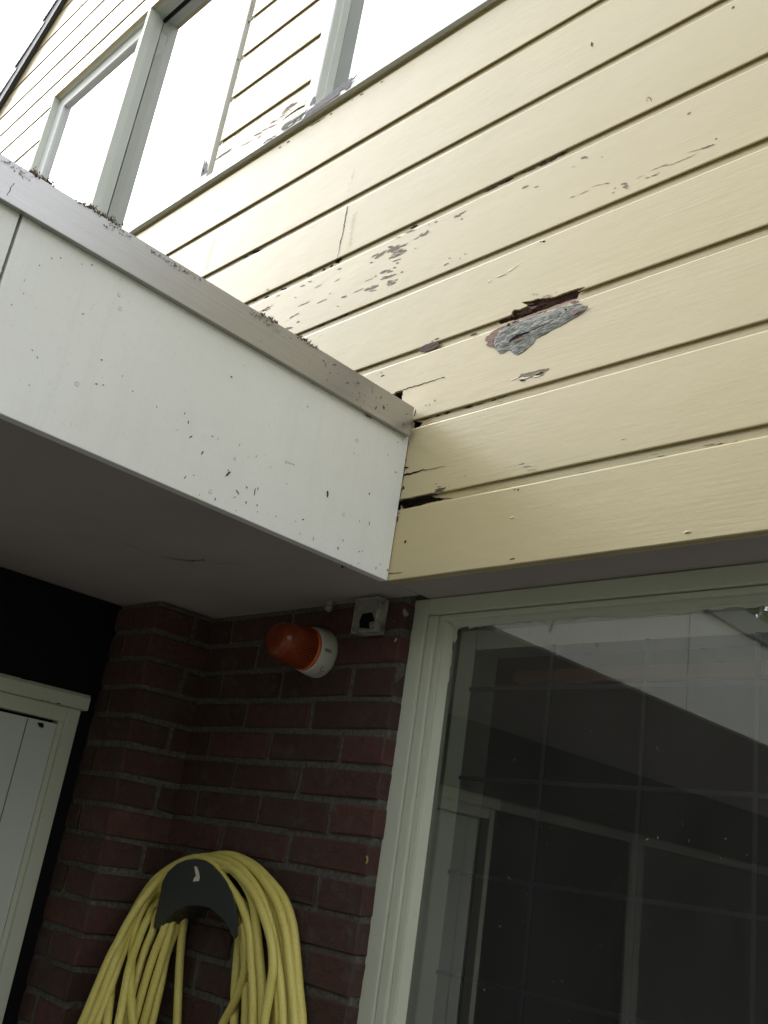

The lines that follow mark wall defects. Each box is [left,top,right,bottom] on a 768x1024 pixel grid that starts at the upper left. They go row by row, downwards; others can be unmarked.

peeling [200,73,363,177]
peeling [254,221,437,329]
spalling [499,288,587,334]
spalling [511,368,549,381]